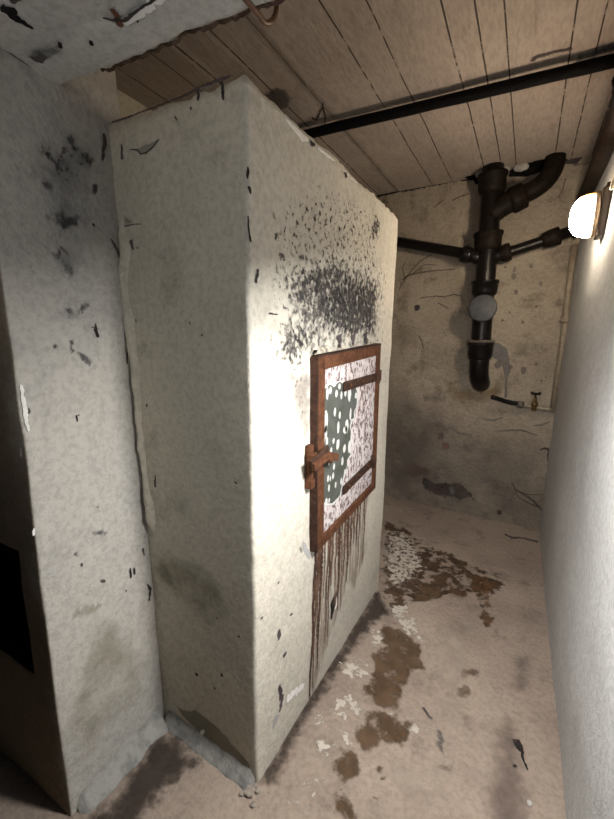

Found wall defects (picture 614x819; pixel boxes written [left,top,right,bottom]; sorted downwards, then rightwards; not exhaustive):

leakage [42,135,91,180]
leakage [56,215,79,229]
rust [309,498,367,698]
leakage [334,626,425,781]